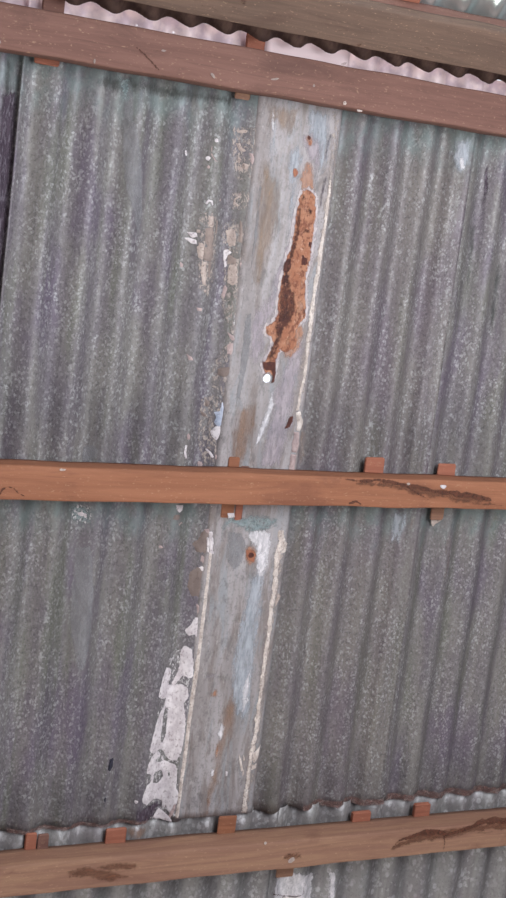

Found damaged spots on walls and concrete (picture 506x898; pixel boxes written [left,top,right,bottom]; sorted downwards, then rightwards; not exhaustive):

peeling [184,191,249,466]
peeling [232,126,256,180]
rust [260,163,318,383]
peeling [134,529,214,822]